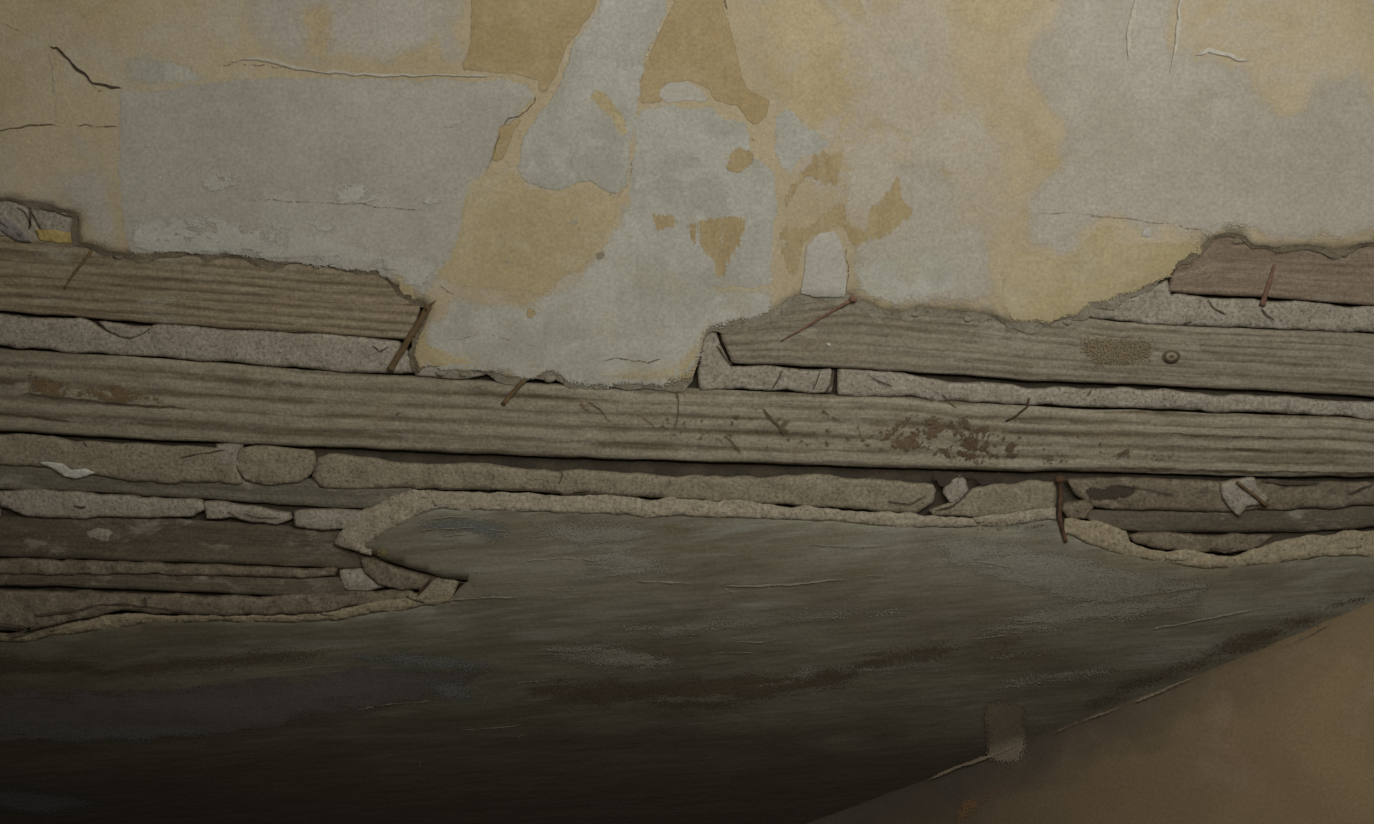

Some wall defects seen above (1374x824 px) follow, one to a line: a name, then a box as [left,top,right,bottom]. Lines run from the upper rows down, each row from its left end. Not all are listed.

crack [4,23,121,91]
crack [0,123,117,131]
peeling [462,0,769,196]
peeling [0,150,1374,392]
corrosion [645,394,1178,471]
spalling [333,489,1374,569]
spalling [0,591,454,643]